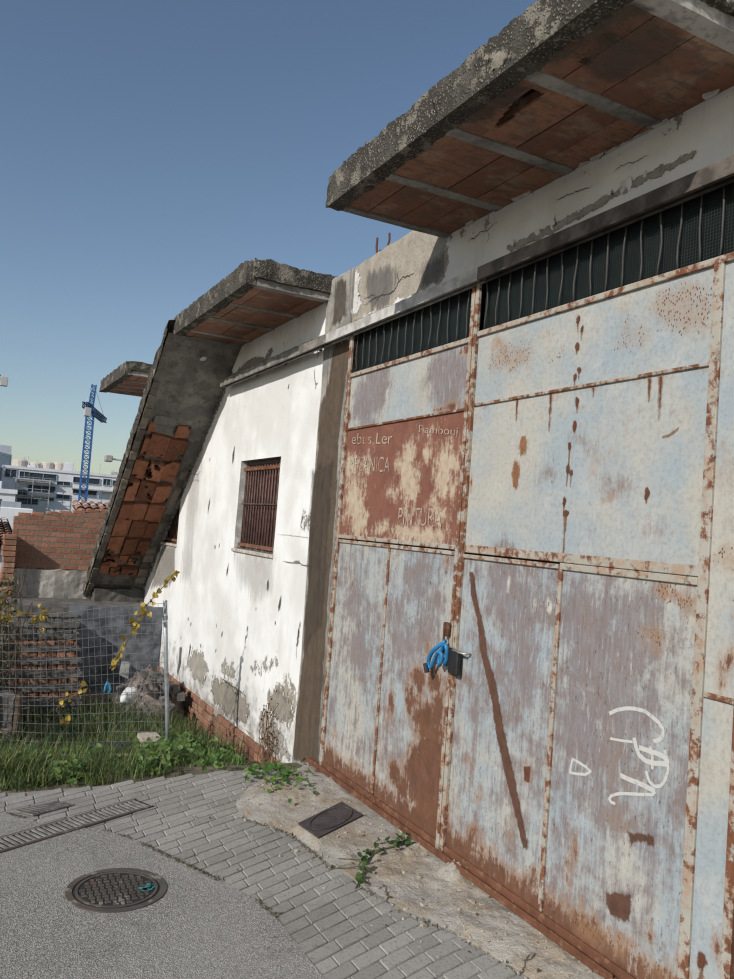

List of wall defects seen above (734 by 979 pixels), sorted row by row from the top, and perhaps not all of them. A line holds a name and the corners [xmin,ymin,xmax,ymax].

peeling [507,151,696,252]
corrosion [566,367,581,487]
peeling [180,639,294,760]
corrosion [469,572,530,849]
corrosion [629,833,654,846]
corrosion [606,892,631,922]
corrosion [697,952,707,979]